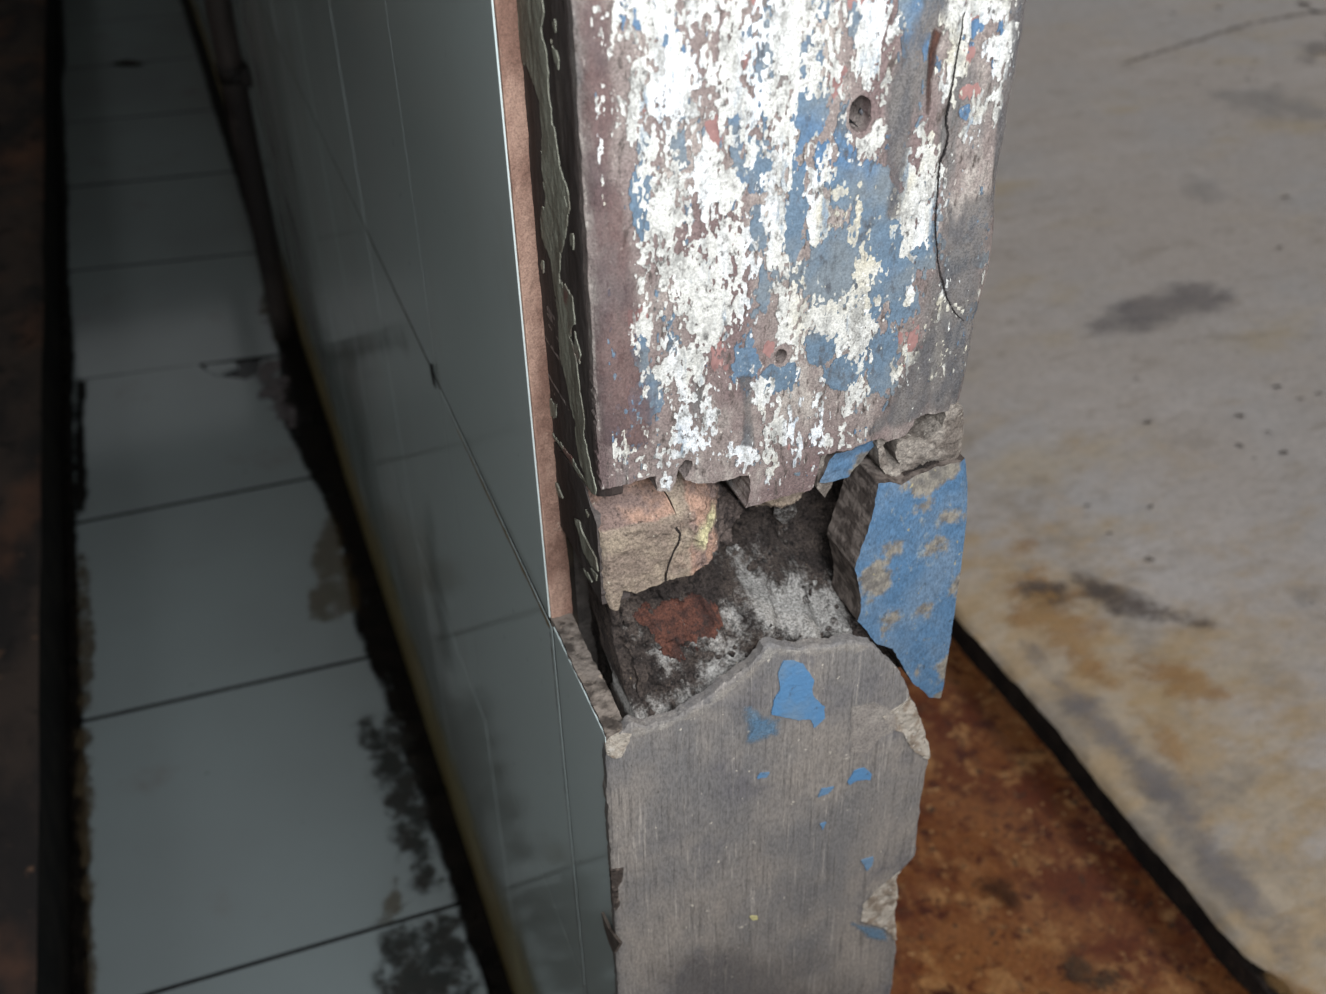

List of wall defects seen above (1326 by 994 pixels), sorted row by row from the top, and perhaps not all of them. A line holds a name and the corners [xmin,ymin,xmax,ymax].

water stain [180,0,250,225]
crack [935,12,966,320]
crack [1121,10,1326,65]
peeling [516,0,1019,759]
water stain [257,268,534,994]
peeling [818,767,872,797]
spalling [852,871,901,940]